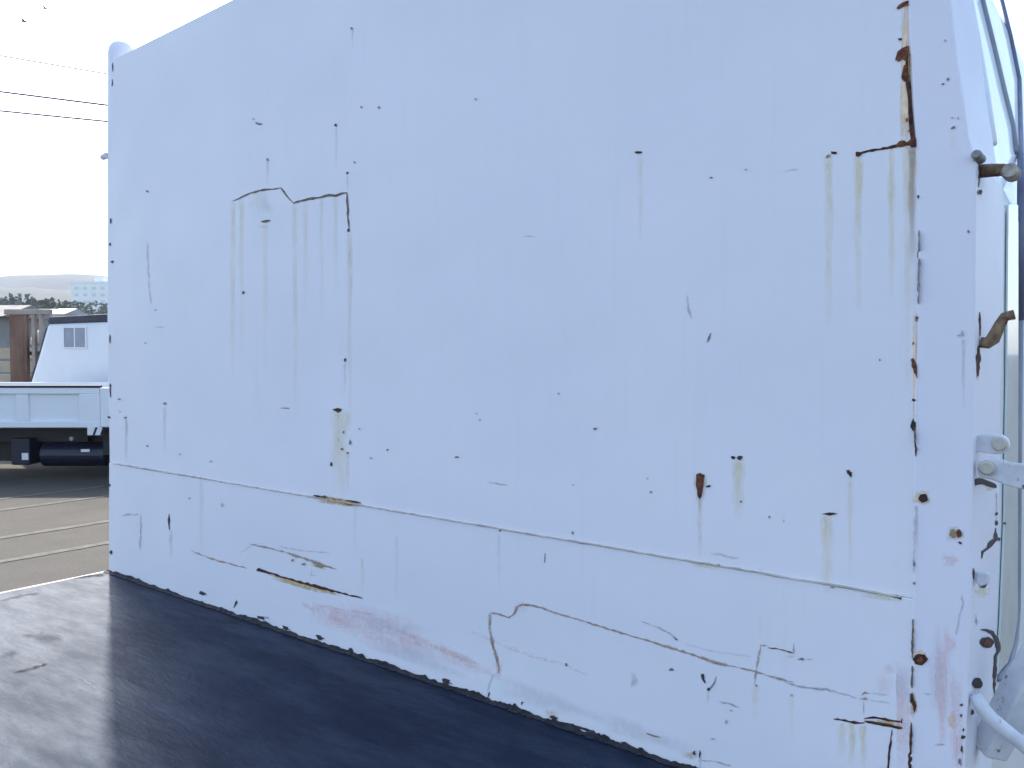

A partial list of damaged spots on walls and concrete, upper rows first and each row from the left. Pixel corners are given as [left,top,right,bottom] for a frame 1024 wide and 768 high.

corrosion [856,0,919,198]
crack [233,187,350,232]
corrosion [910,230,921,456]
corrosion [313,495,360,506]
corrosion [696,473,705,499]
peeling [104,570,701,768]
crack [489,604,902,768]
corrosion [908,619,928,768]